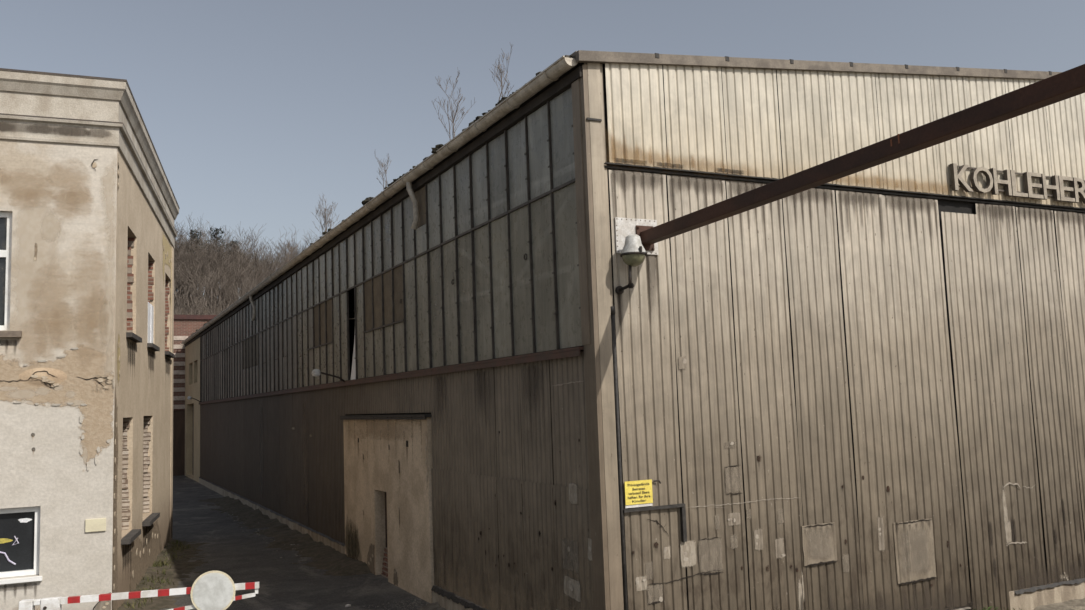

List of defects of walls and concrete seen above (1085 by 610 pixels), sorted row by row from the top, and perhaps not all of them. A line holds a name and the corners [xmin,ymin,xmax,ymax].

crack [0,371,107,388]
flaking render [0,336,121,610]
spalling [130,522,161,592]